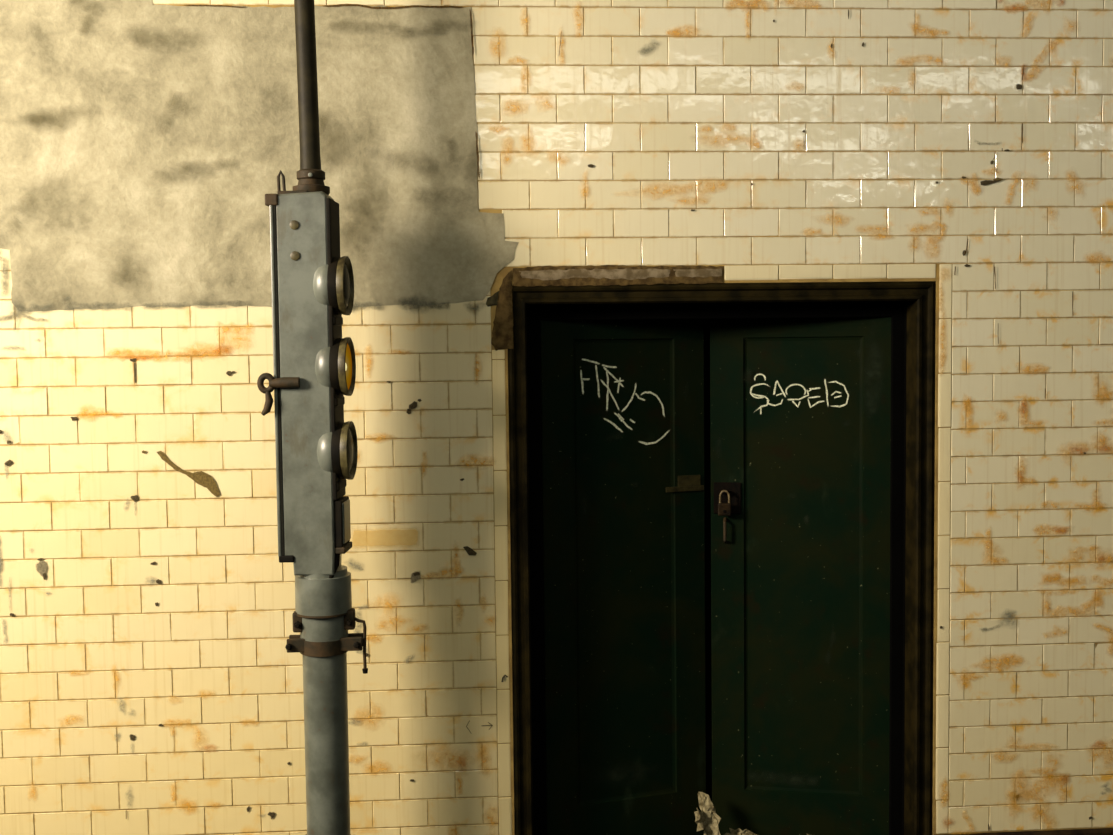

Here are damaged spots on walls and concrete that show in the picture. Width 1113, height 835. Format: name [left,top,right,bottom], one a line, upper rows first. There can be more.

peeling [486,291,499,307]